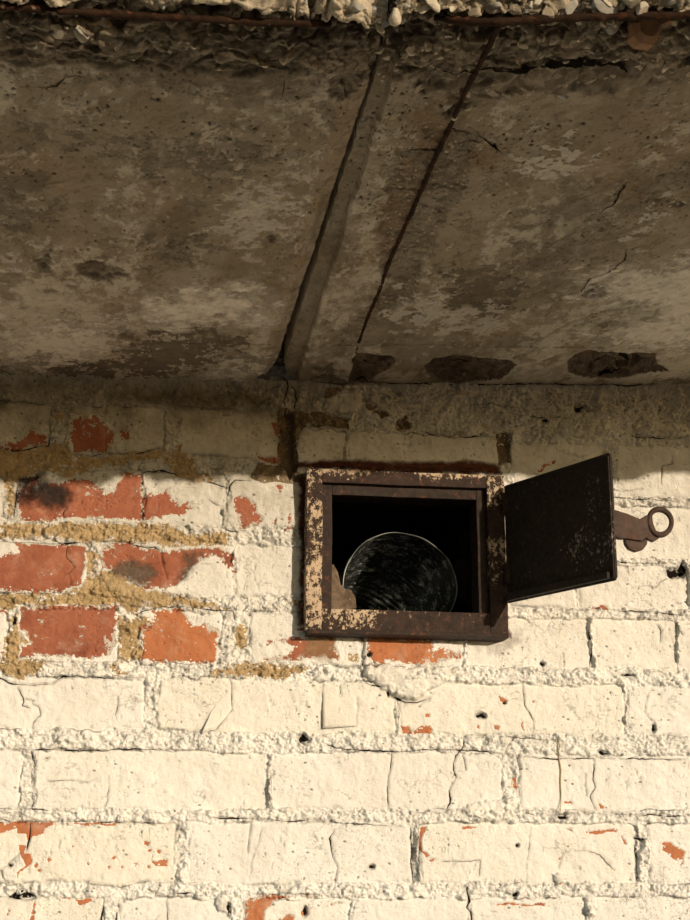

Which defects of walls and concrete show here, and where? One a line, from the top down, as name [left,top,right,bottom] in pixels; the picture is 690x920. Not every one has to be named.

spalling [0,0,690,317]
leakage [427,263,529,325]
leakage [32,326,276,382]
leakage [314,363,356,385]
peeling [0,408,462,681]
corrosion [296,460,503,626]
crack [0,675,146,723]
crack [0,780,160,849]
crack [24,748,187,770]
crack [213,688,688,882]
peeling [0,821,54,878]
peeling [243,894,316,920]